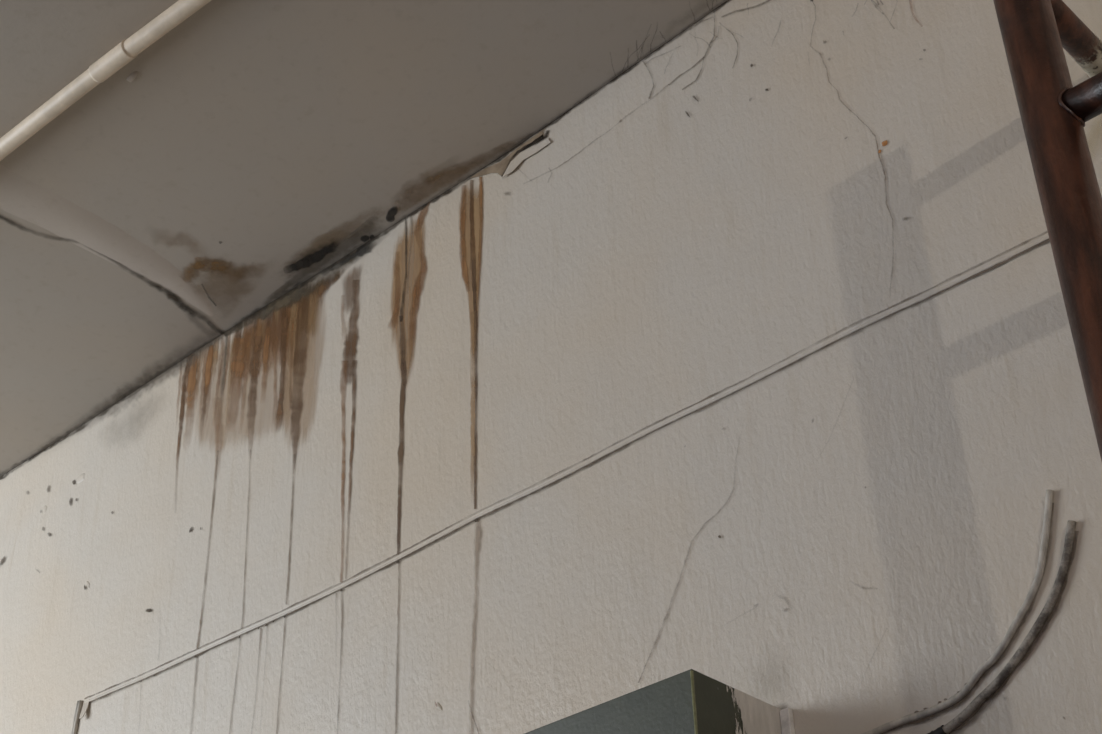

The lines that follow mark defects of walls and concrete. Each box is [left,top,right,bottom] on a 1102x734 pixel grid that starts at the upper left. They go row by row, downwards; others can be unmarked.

crack [610,31,685,83]
rust [185,259,229,279]
rust [177,272,359,507]
crack [0,97,589,480]
leakage [224,228,374,336]
leakage [386,208,397,222]
rust [391,202,429,555]
rust [460,177,483,509]
crack [838,94,893,220]